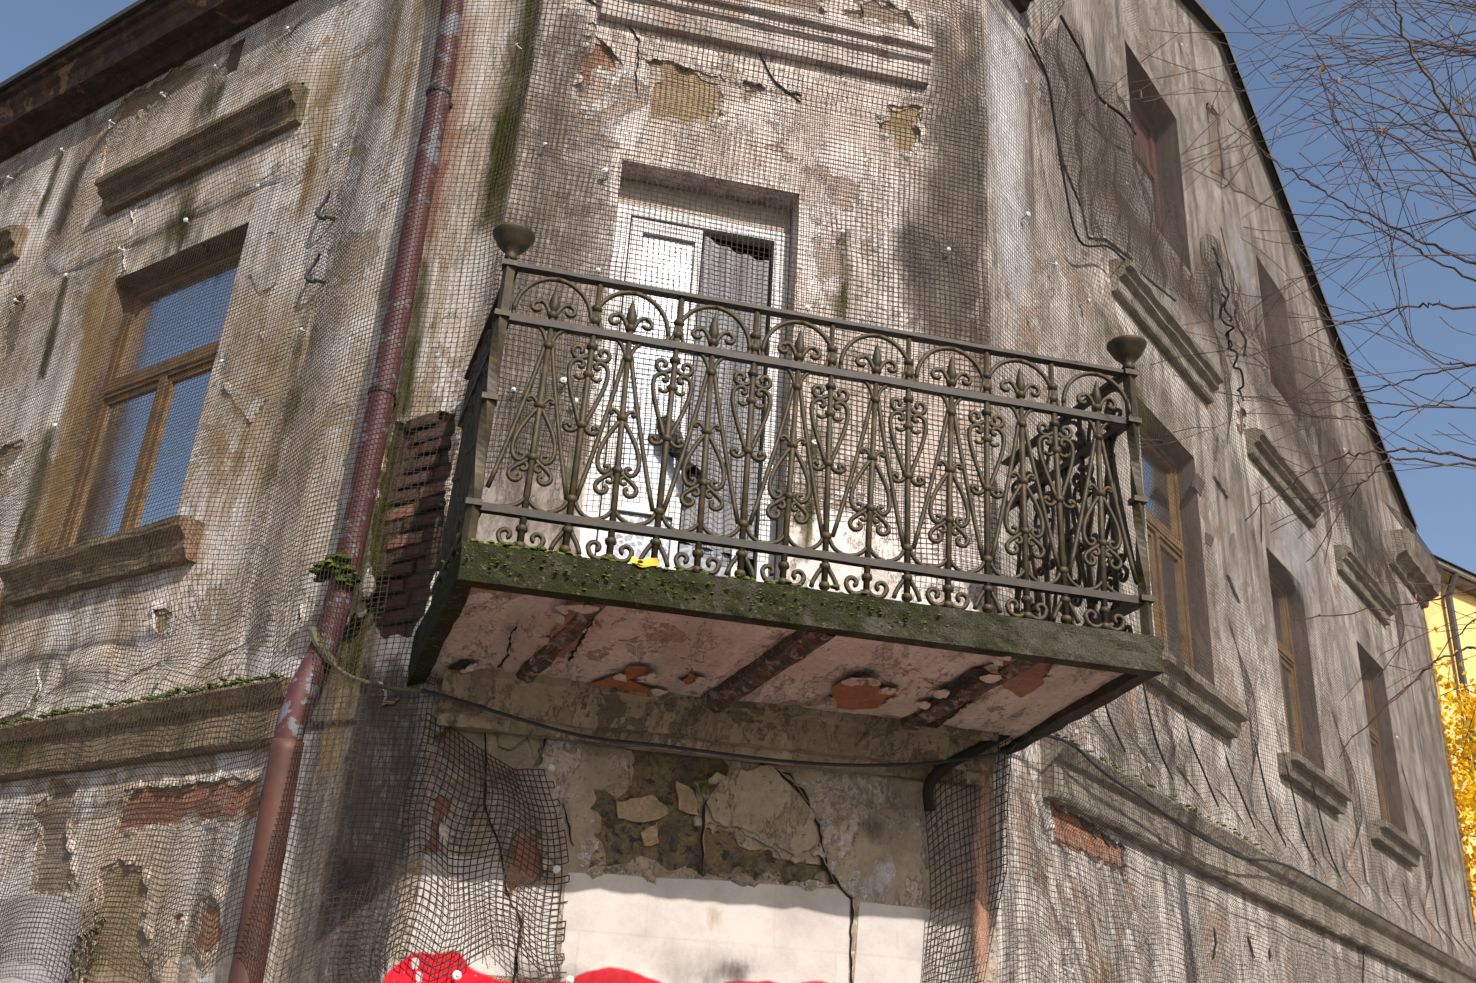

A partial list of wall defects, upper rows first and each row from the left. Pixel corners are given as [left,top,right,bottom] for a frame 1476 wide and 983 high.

flaking render [752,0,921,32]
flaking render [570,22,623,96]
flaking render [642,55,769,130]
flaking render [876,106,928,162]
leakage [476,15,598,540]
flaking render [363,412,461,639]
flaking render [911,656,1062,728]
flaking render [23,770,262,983]
flaking render [584,748,834,892]
crack [700,796,738,876]
crack [757,762,856,983]
flaking render [1047,803,1128,884]